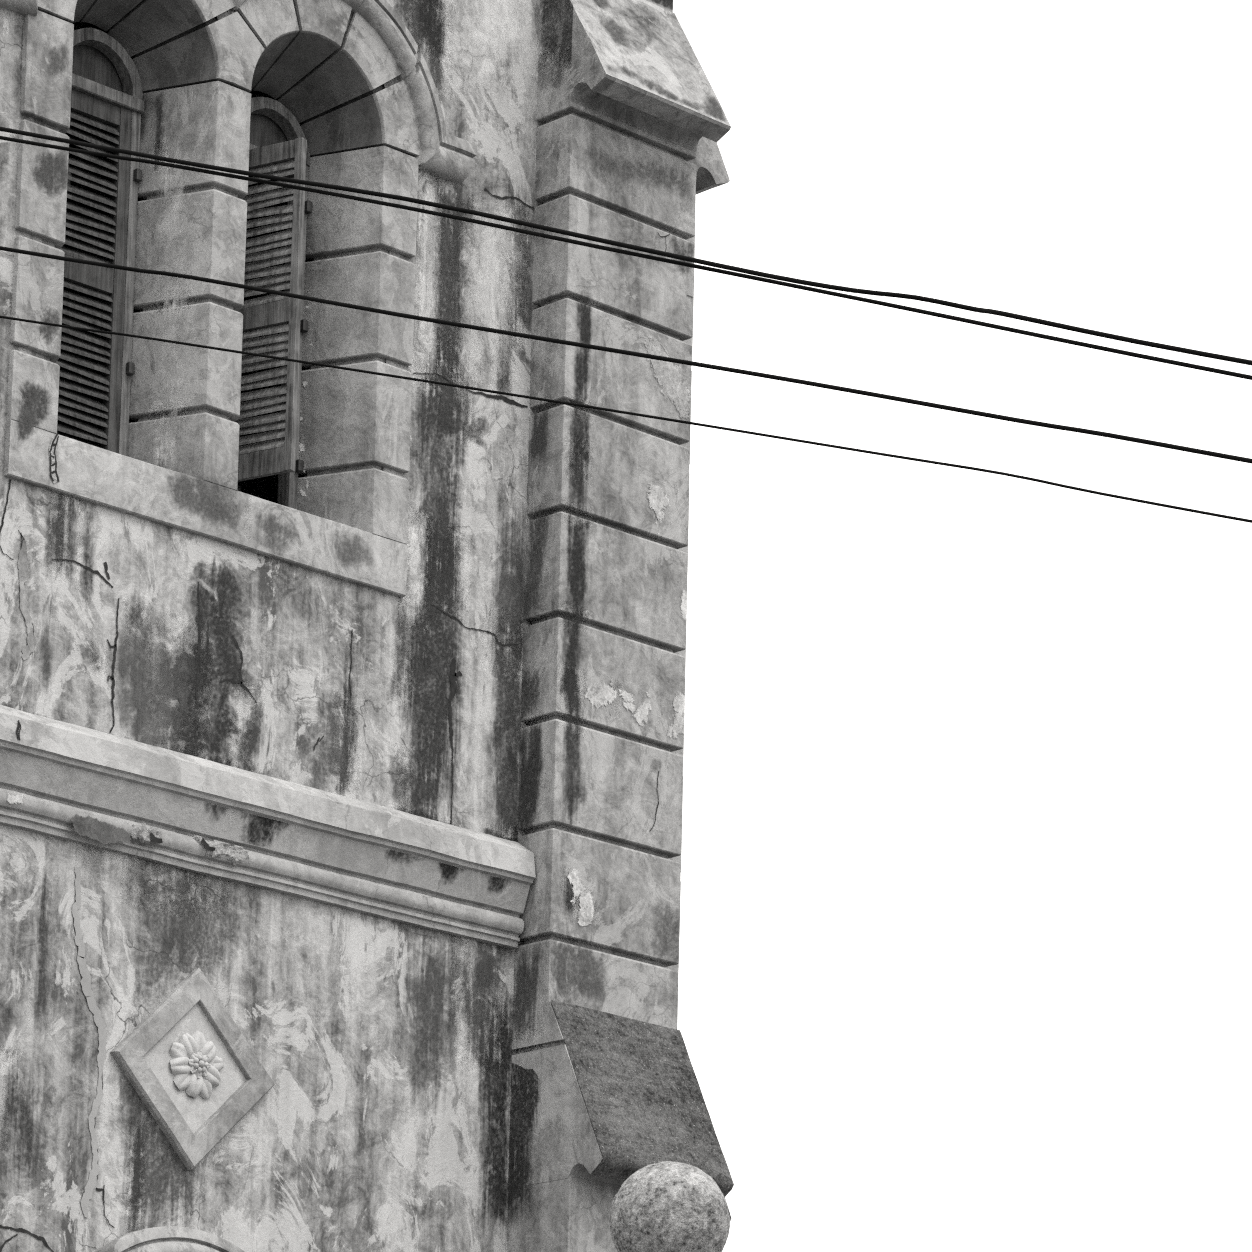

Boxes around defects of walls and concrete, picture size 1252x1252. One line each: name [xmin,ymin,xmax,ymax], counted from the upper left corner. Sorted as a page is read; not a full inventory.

leakage [18,382,49,439]
leakage [342,0,534,821]
crack [413,372,528,408]
leakage [562,301,591,825]
leakage [119,566,261,771]
leakage [485,508,547,842]
peeling [584,680,652,727]
peeling [667,693,685,739]
flaking render [194,835,249,865]
peeling [567,868,594,926]
crack [72,866,115,1228]
crack [0,1225,54,1252]